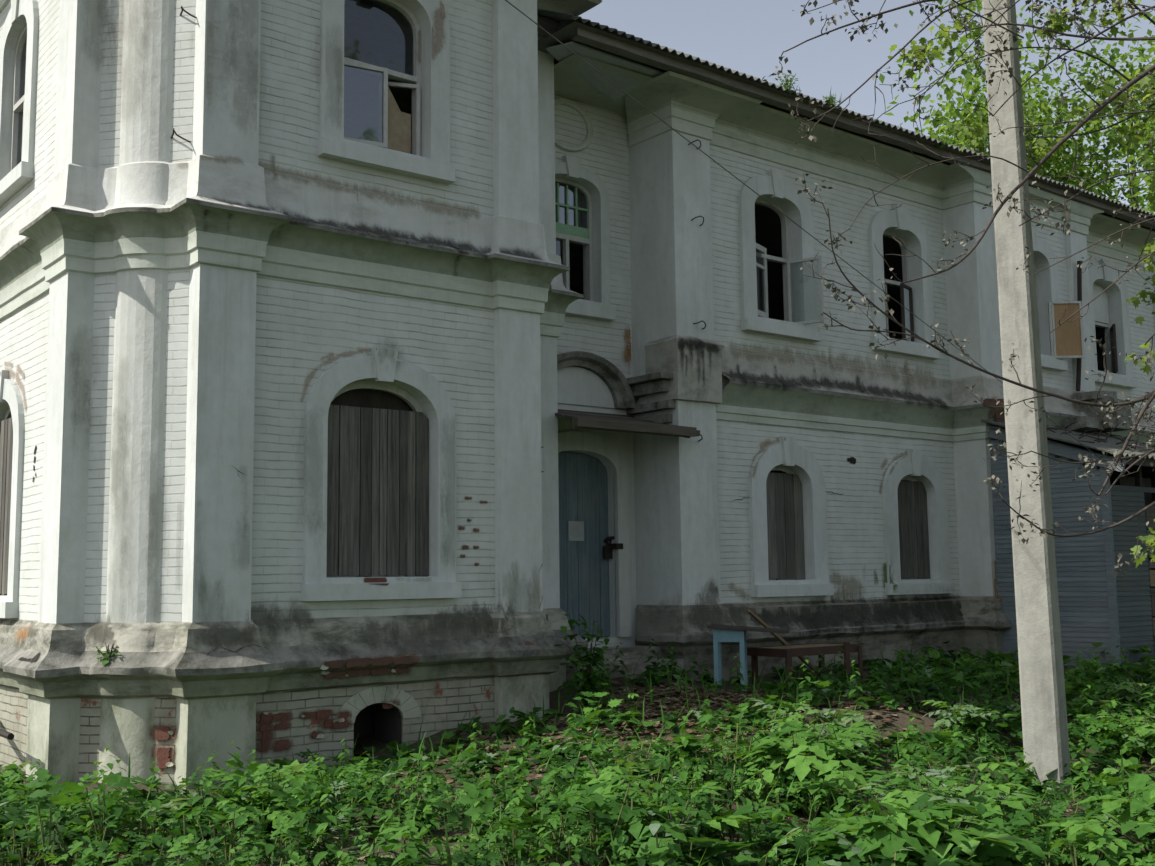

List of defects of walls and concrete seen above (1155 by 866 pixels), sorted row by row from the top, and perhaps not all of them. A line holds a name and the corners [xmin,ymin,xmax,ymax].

peeling [418,2,445,62]
leakage [678,338,719,380]
peeling [4,362,26,410]
leakage [723,365,946,407]
leakage [85,621,116,642]
leakage [198,606,312,645]
leakage [362,608,506,647]
flaking render [320,656,414,677]
flaking render [150,725,176,769]
flaking render [256,710,352,752]